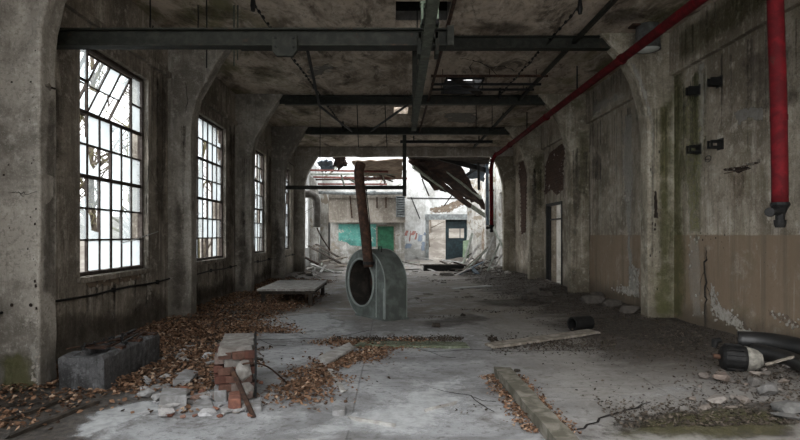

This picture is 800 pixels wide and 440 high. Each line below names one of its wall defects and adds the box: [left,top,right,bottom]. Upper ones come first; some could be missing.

flaking render [518,161,527,234]
flaking render [544,144,565,195]
leakage [674,72,706,240]
crack [700,250,713,322]
peeling [692,283,751,331]